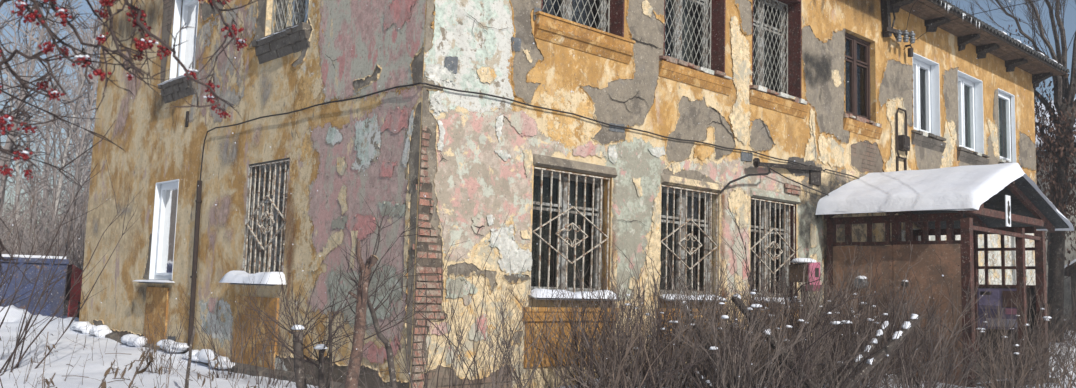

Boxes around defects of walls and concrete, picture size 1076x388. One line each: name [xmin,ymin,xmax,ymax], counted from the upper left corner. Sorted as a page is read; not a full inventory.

peeling [978,233,1036,285]